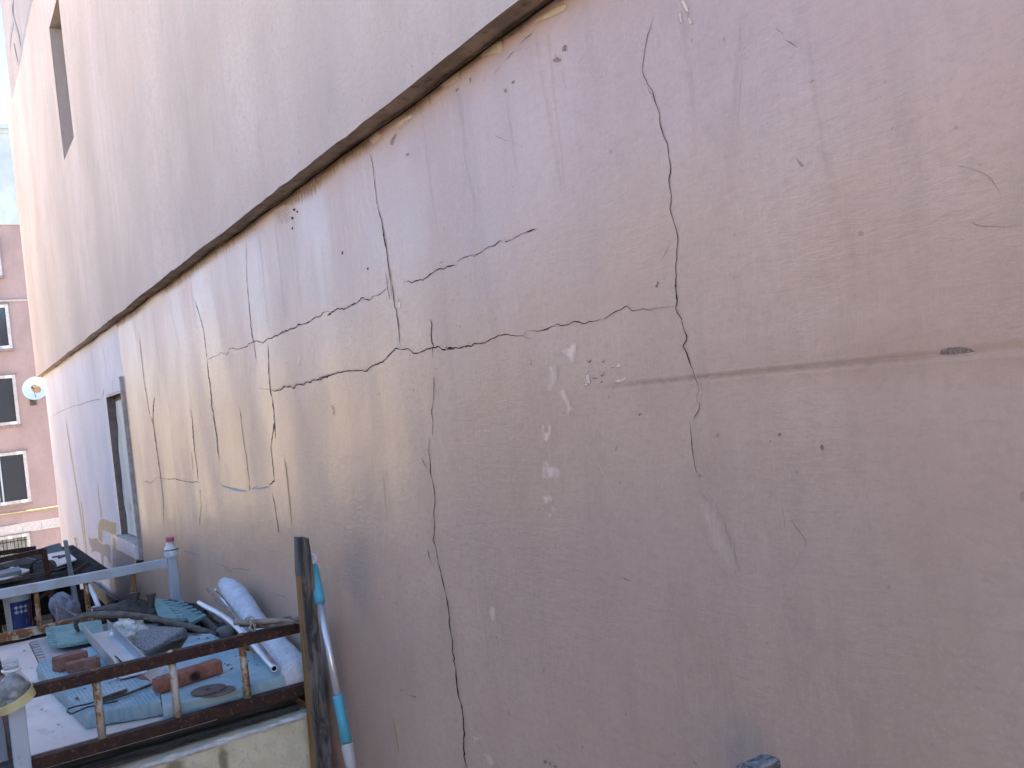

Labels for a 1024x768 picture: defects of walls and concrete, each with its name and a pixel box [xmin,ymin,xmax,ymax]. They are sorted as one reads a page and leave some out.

crack [56,0,701,533]
crack [422,388,467,766]